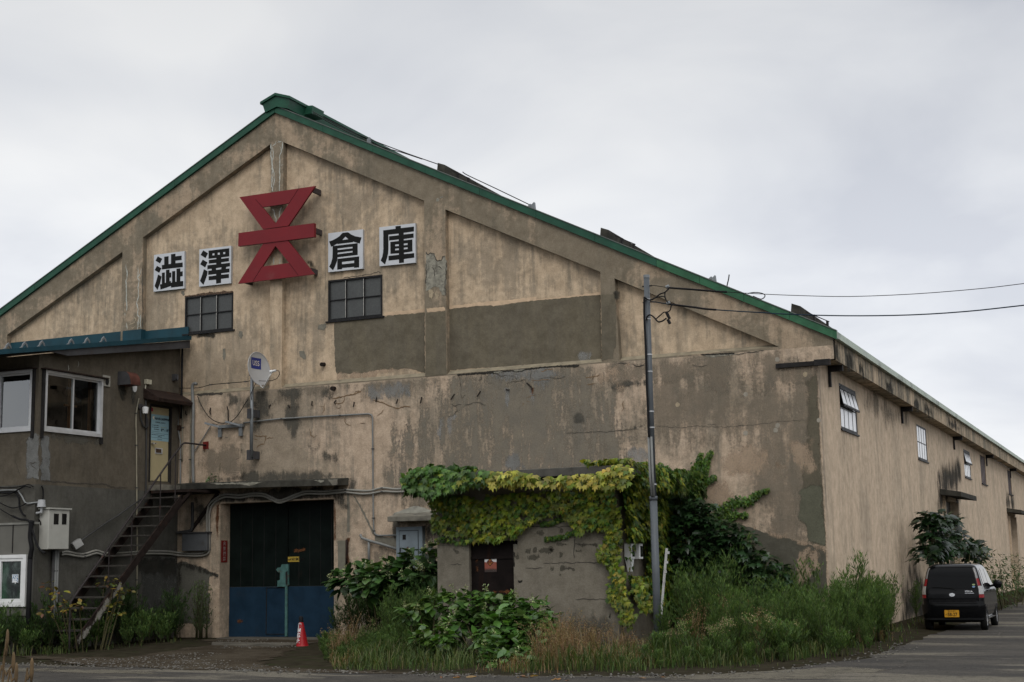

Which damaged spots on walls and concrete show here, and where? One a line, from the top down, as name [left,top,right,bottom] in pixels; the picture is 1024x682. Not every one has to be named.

spalling [425,252,447,300]
leakage [229,386,330,438]
crack [449,362,644,417]
leakage [937,462,961,512]